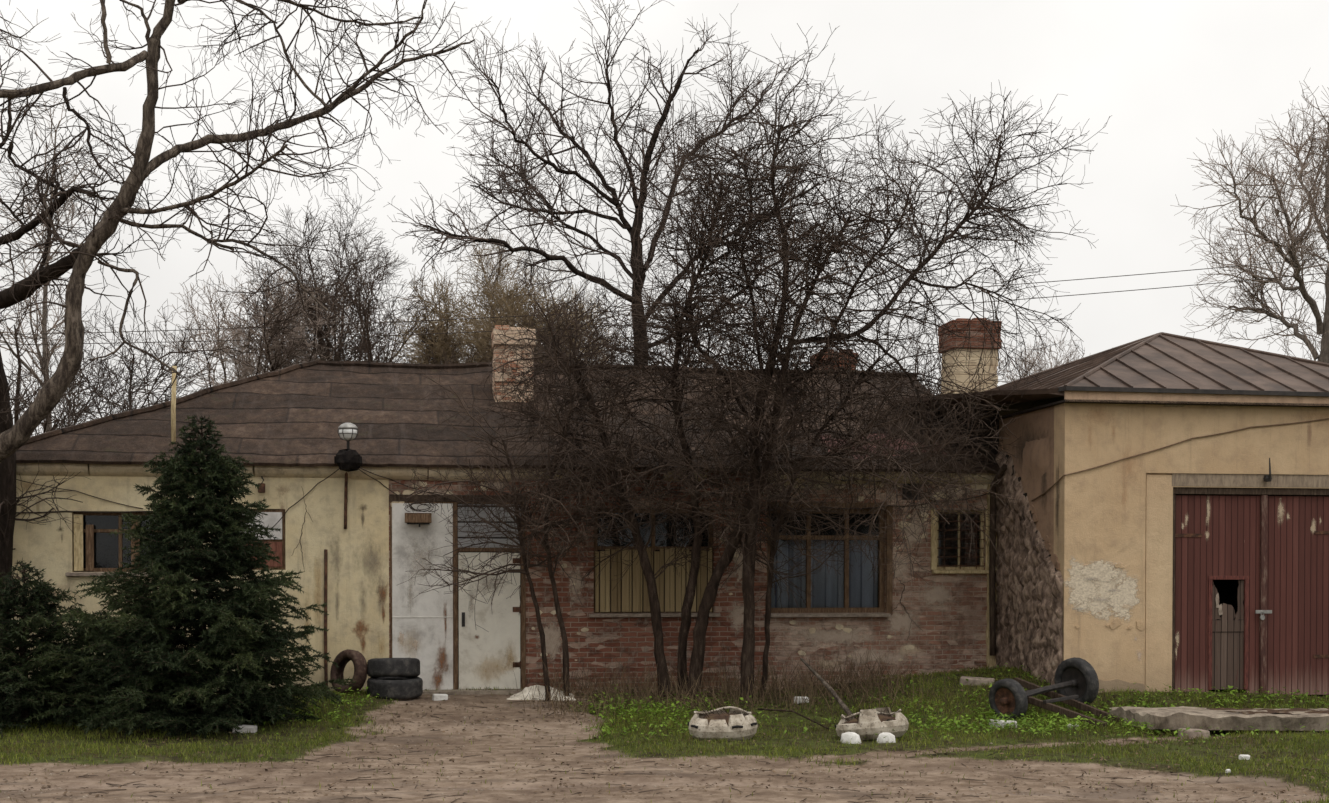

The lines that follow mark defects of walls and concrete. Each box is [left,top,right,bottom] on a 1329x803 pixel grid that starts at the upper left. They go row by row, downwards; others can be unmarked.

spalling [894,442,1144,685]
corrosion [354,622,367,649]
corrosion [434,648,448,688]